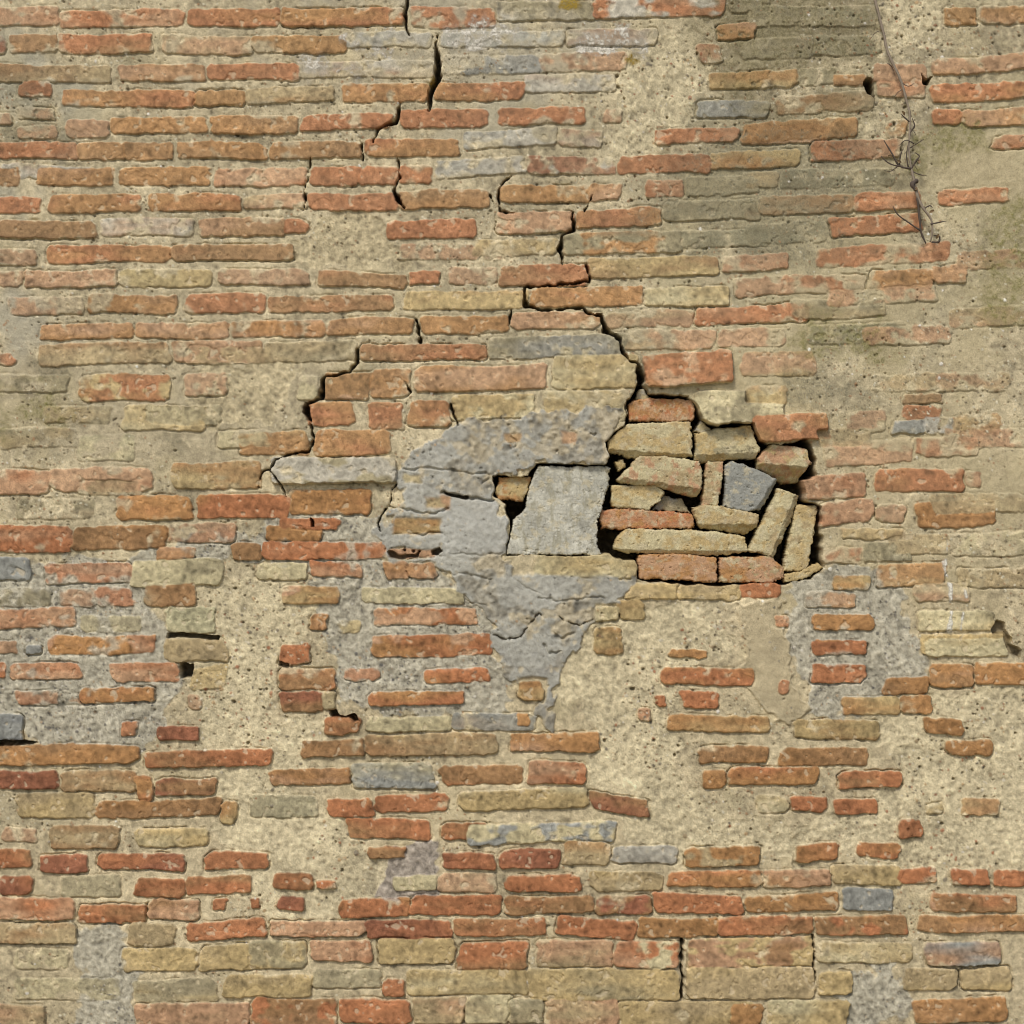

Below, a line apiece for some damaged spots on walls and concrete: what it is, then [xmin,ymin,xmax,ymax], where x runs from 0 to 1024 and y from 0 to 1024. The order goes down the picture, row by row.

crack [402,0,410,36]
crack [359,35,443,161]
crack [302,157,312,211]
crack [392,157,406,209]
crack [489,175,518,214]
crack [415,318,423,344]
crack [508,194,647,422]
crack [257,347,360,497]
crack [449,402,460,427]
spalling [492,385,769,555]
spalling [387,547,443,561]